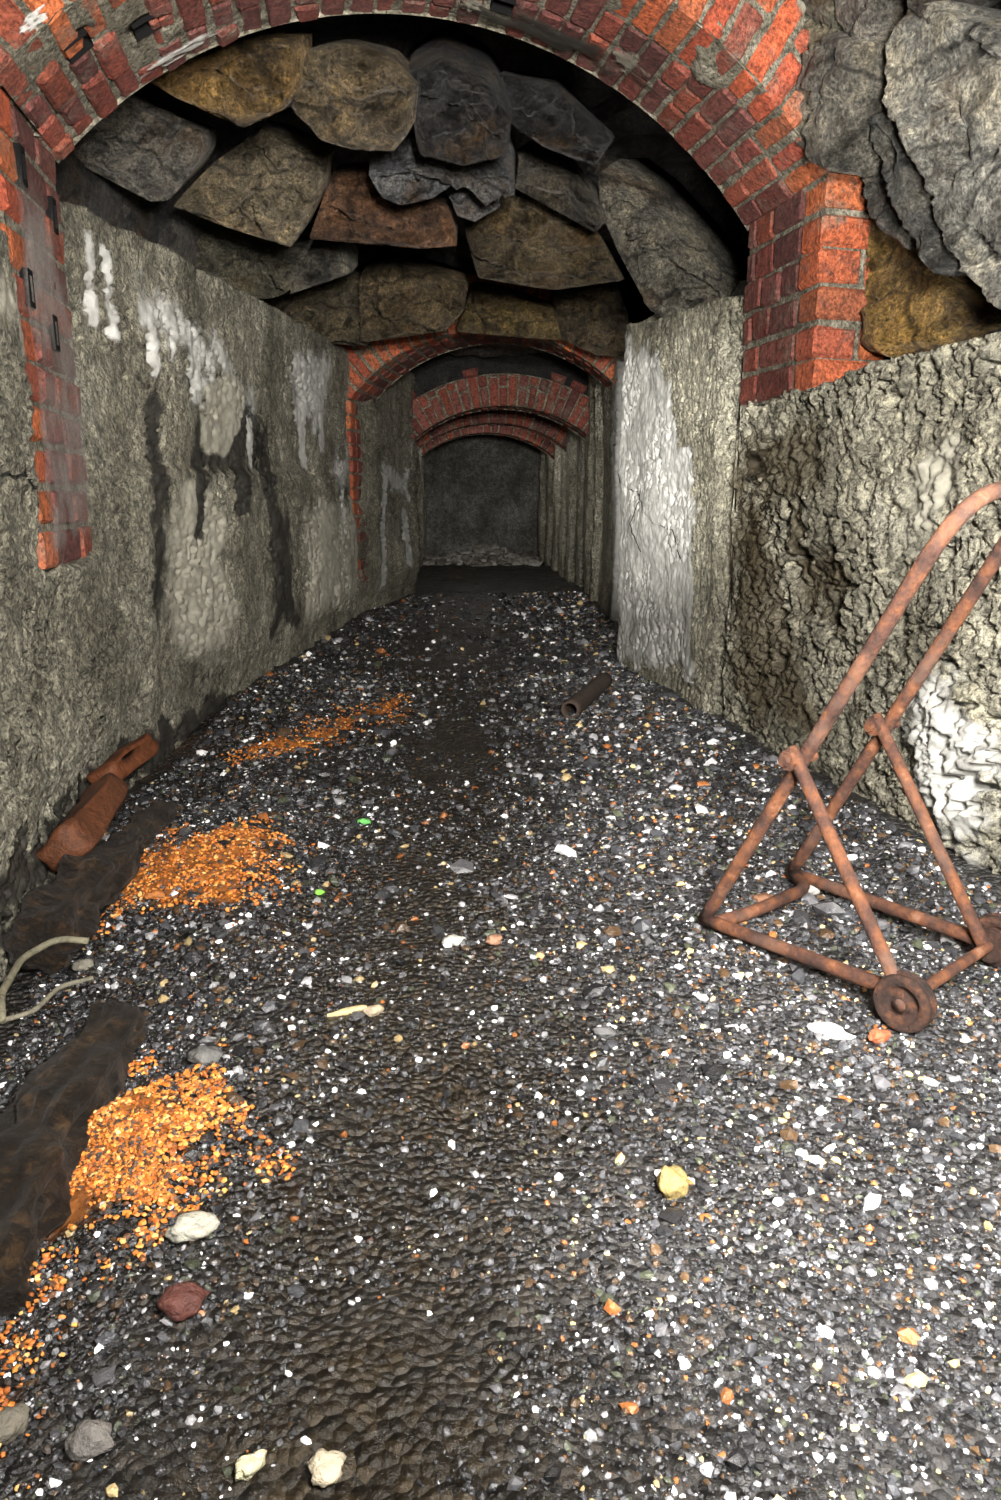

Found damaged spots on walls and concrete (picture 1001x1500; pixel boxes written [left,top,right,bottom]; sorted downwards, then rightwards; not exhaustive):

damp [82,231,121,340]
crack [0,471,38,487]
damp [139,296,301,639]